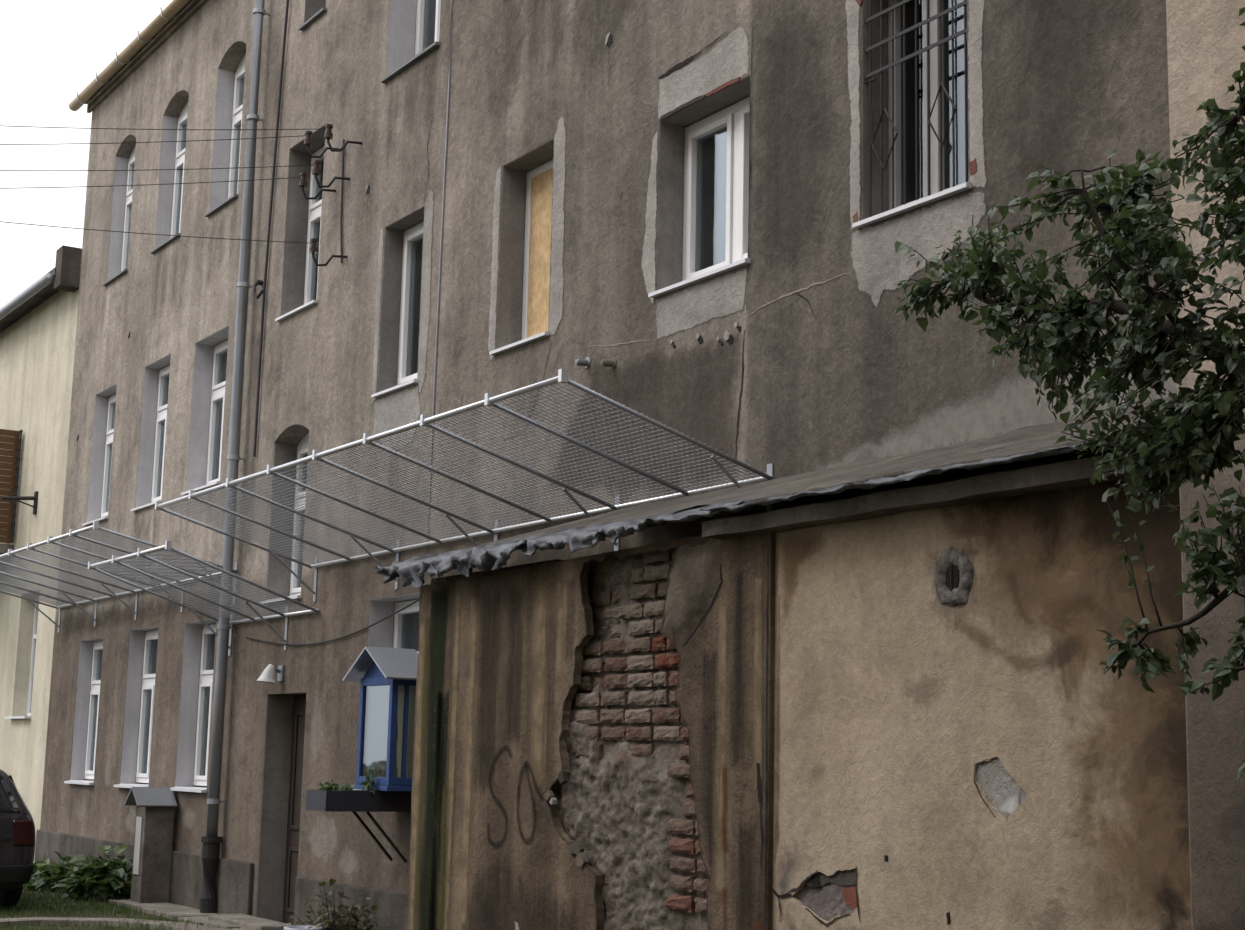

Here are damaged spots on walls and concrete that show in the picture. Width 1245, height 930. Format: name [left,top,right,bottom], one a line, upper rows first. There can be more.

damp [1078,480,1185,686]
spalling [544,550,712,930]
peeling [974,757,1027,820]
spalling [786,866,861,927]